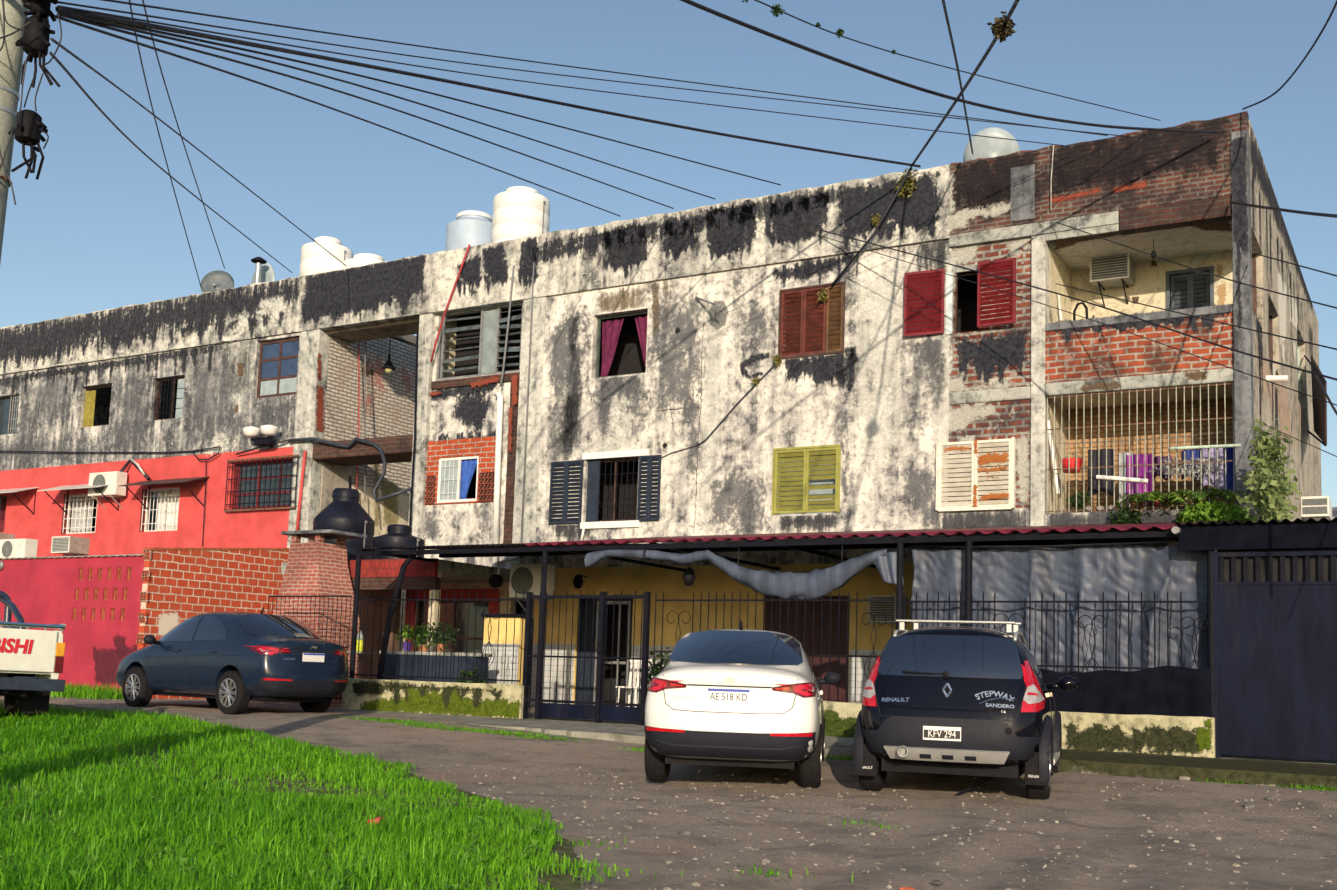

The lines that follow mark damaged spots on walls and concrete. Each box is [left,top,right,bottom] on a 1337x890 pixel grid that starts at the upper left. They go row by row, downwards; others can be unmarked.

flaking render [1049,180,1148,203]
spalling [1191,221,1232,232]
leakage [457,117,1313,501]
peeling [933,171,1031,442]
leakage [0,255,427,469]
spalling [1185,370,1208,381]
leakage [431,383,497,441]
leakage [709,465,836,535]
leakage [904,463,1026,537]
leakage [1051,509,1184,534]
leakage [352,680,503,710]